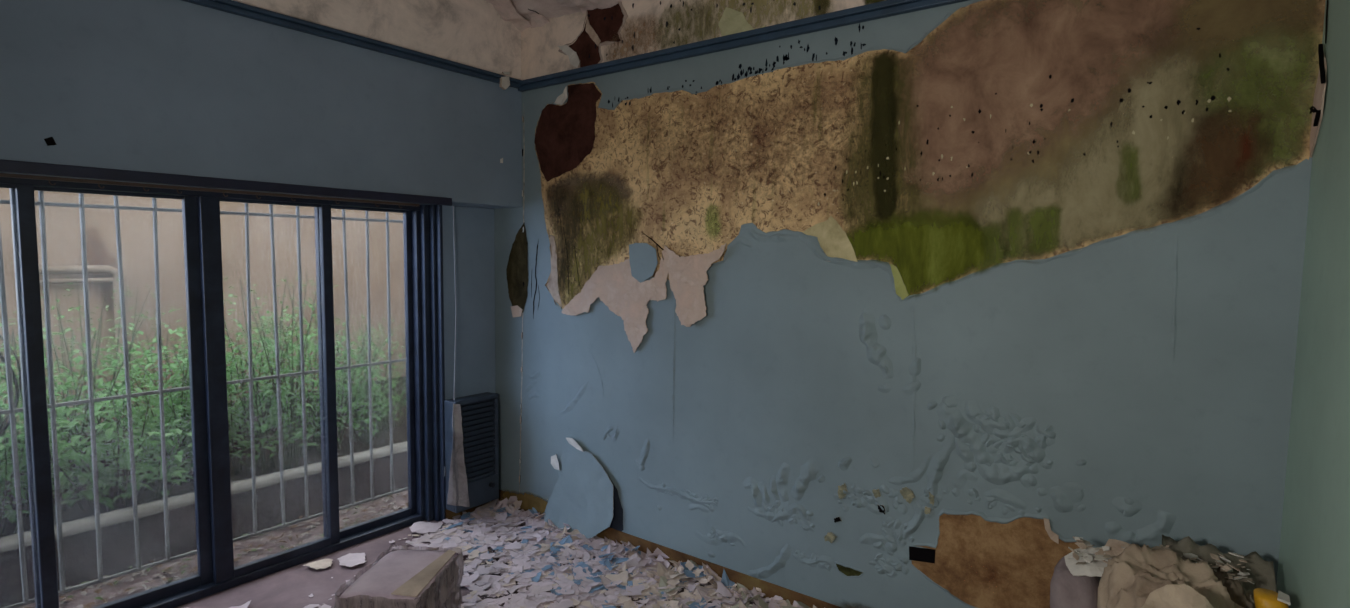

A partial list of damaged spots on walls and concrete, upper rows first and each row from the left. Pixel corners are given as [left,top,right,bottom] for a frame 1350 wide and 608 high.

peeling [506,222,528,317]
damp [547,173,641,303]
peeling [533,0,1327,353]
damp [648,0,1316,296]
peeling [906,508,1097,608]